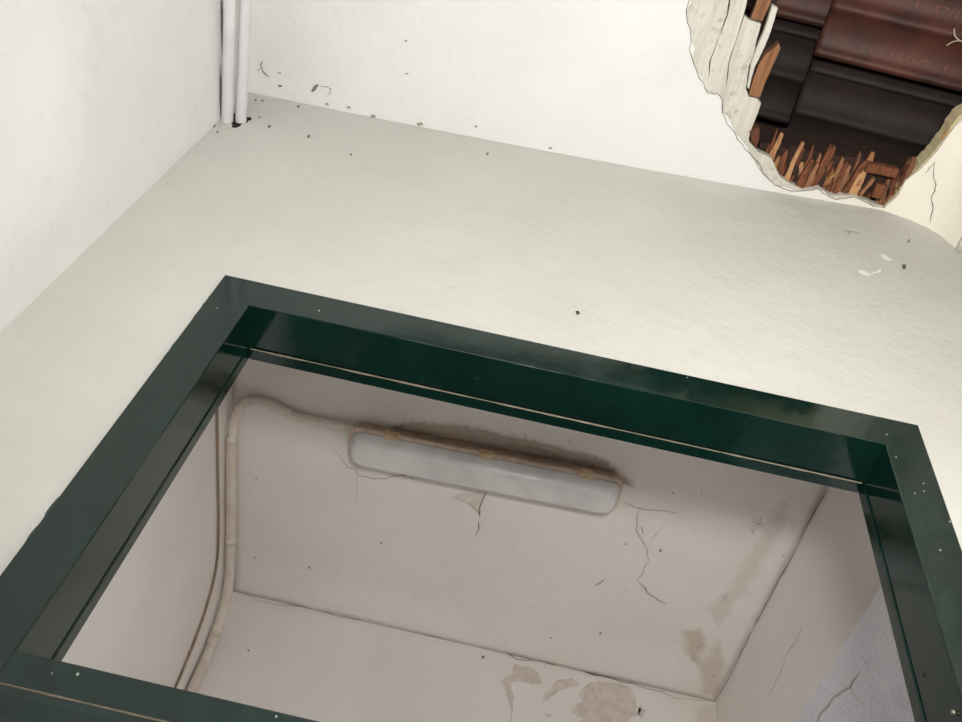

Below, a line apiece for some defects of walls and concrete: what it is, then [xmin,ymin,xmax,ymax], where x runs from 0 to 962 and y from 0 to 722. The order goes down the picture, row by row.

spalling [911,103,962,175]
peeling [501,663,646,722]